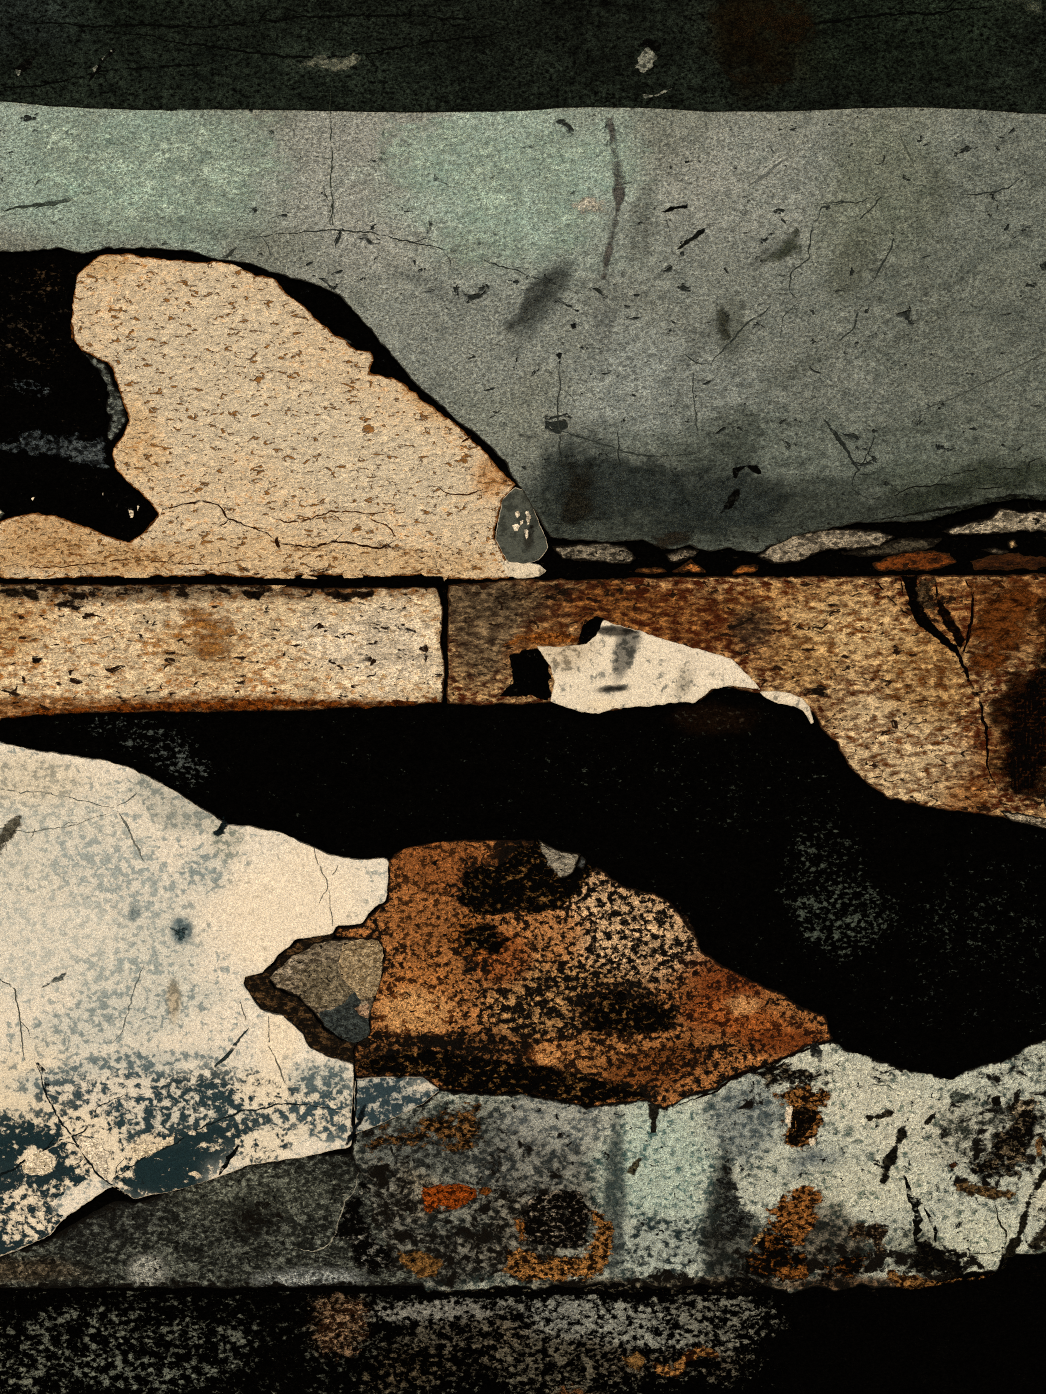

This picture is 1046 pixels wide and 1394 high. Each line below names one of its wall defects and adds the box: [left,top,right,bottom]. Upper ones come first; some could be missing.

spalling [0,253,706,589]
crack [12,500,395,582]
flaking render [732,508,1046,575]
rust [10,696,442,718]
peeling [537,620,814,724]
crack [875,573,998,789]
rust [967,581,1046,793]
flaking render [0,741,833,1256]
crack [0,971,359,1252]
crack [675,1040,830,1108]
rust [749,1062,831,1152]
rust [502,1188,614,1282]